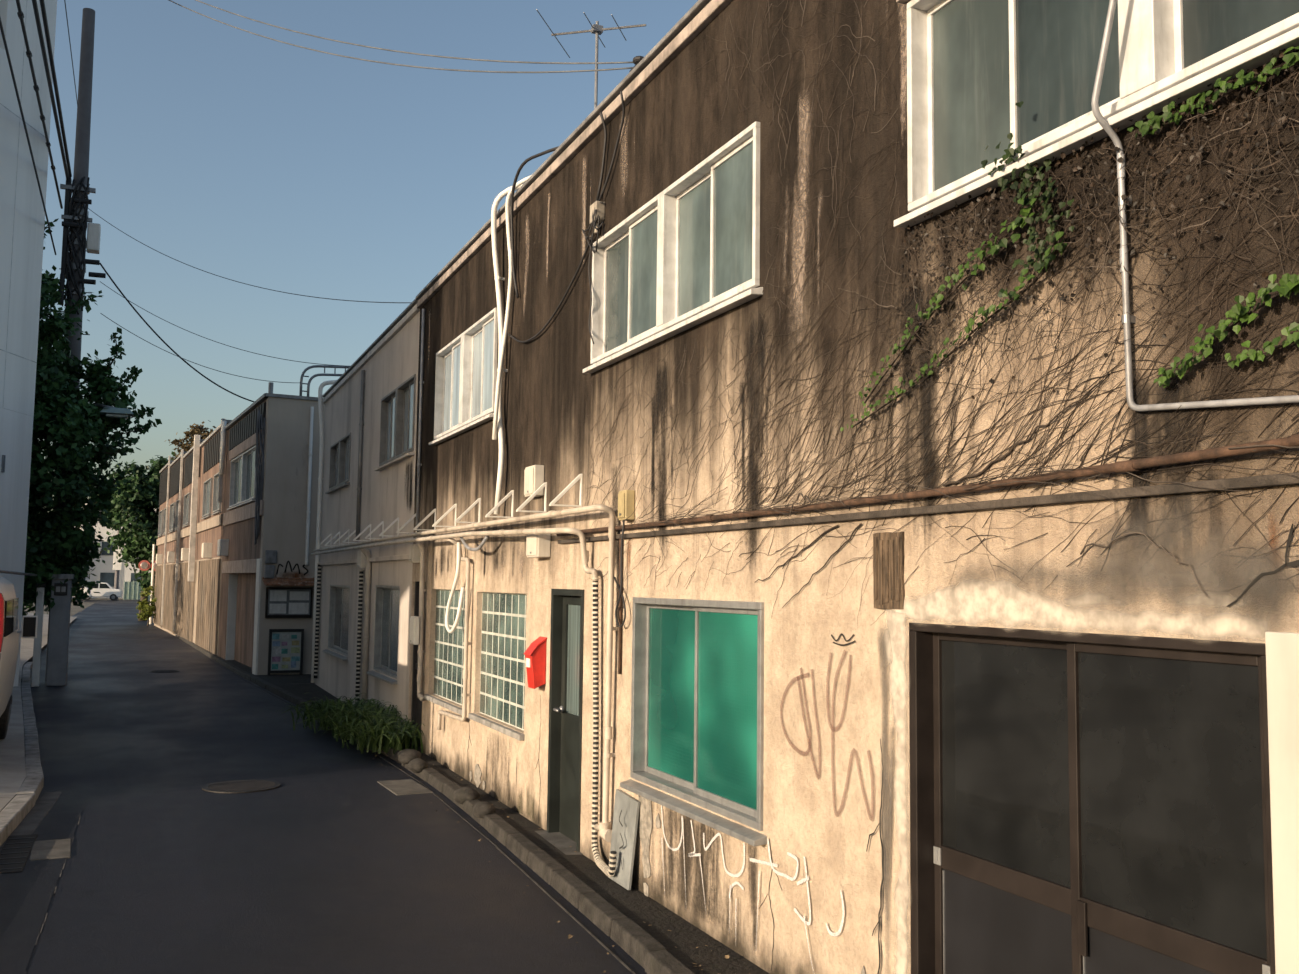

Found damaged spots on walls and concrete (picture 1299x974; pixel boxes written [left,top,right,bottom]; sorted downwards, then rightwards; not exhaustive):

leakage [793,103,819,314]
leakage [651,366,673,547]
leakage [740,320,770,555]
leakage [889,281,954,528]
crack [866,739,884,974]